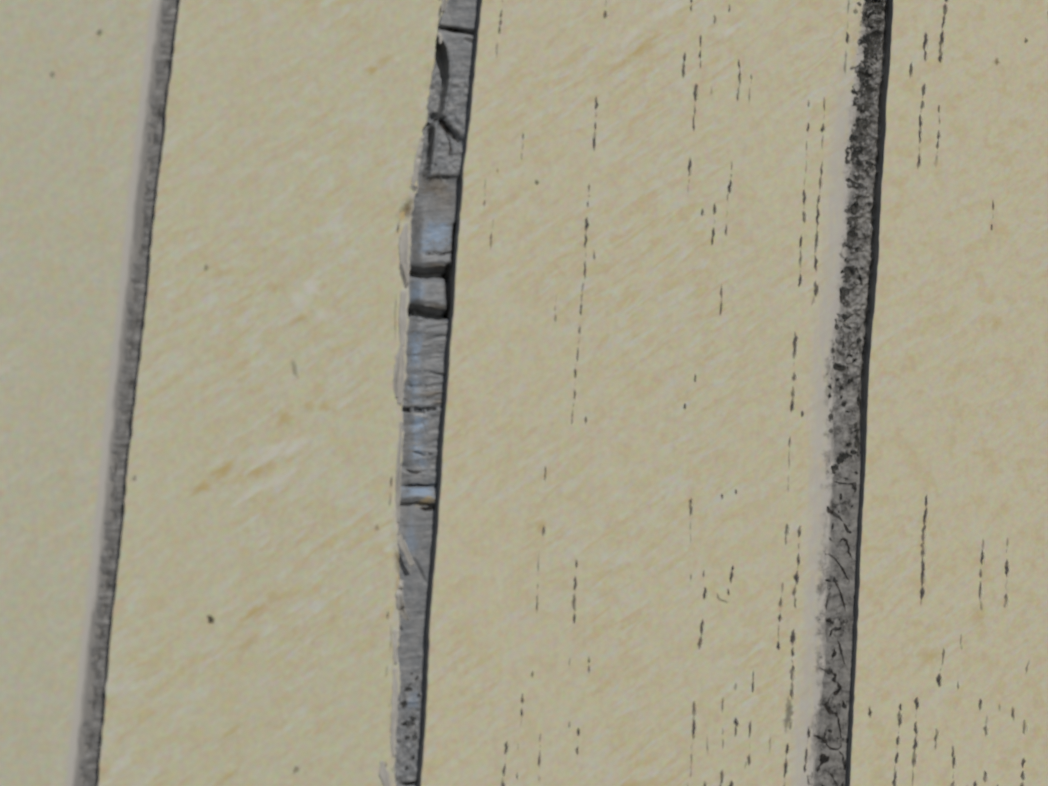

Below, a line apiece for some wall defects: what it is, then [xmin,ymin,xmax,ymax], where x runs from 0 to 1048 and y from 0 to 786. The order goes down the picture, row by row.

peeling [393,136,424,404]
leakage [810,0,887,786]
peeling [379,421,415,786]